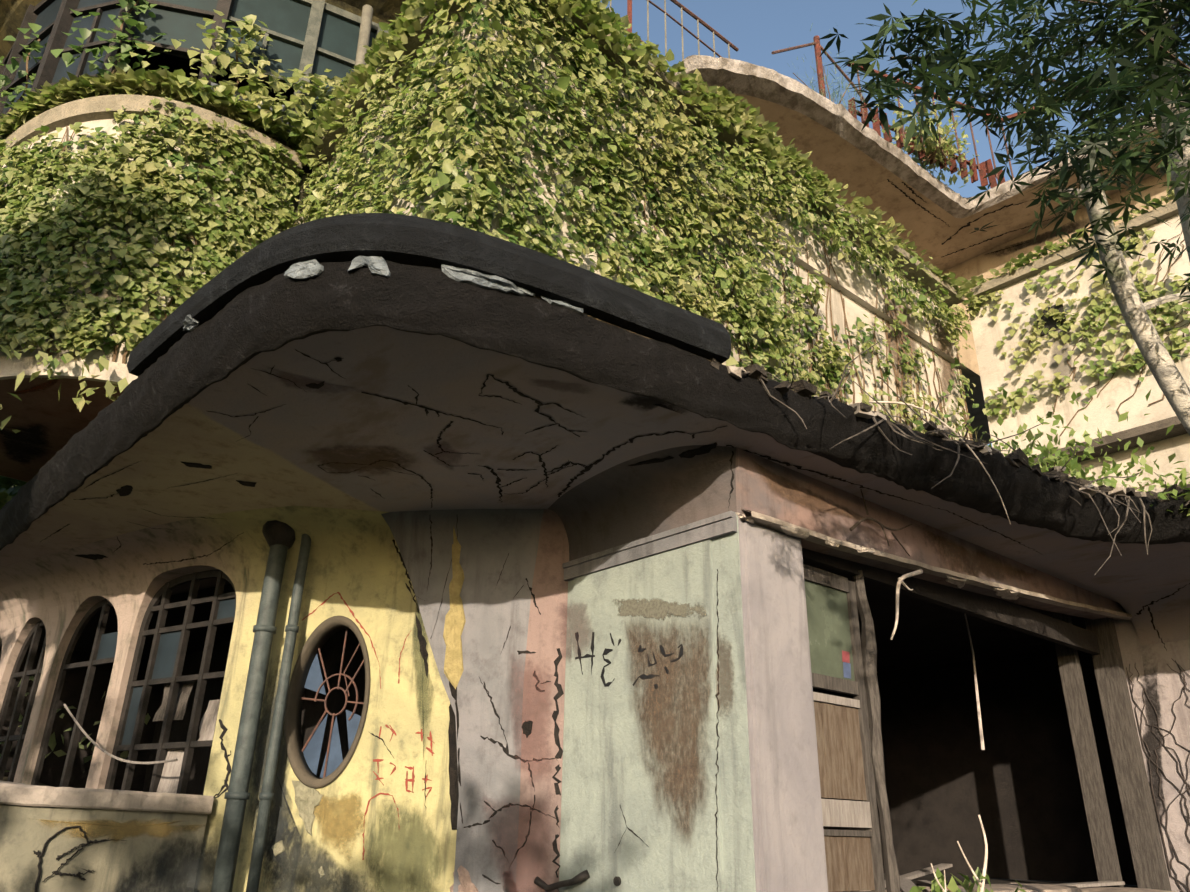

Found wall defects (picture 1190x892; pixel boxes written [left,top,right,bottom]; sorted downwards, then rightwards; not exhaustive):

leakage [0,424,48,463]
crack [43,461,140,540]
crack [112,509,244,565]
crack [208,349,1041,639]
leakage [251,660,441,892]
spalling [415,613,428,676]
leakage [413,599,431,725]
peeling [443,527,466,830]
spalling [522,720,533,738]
leakage [615,598,710,833]